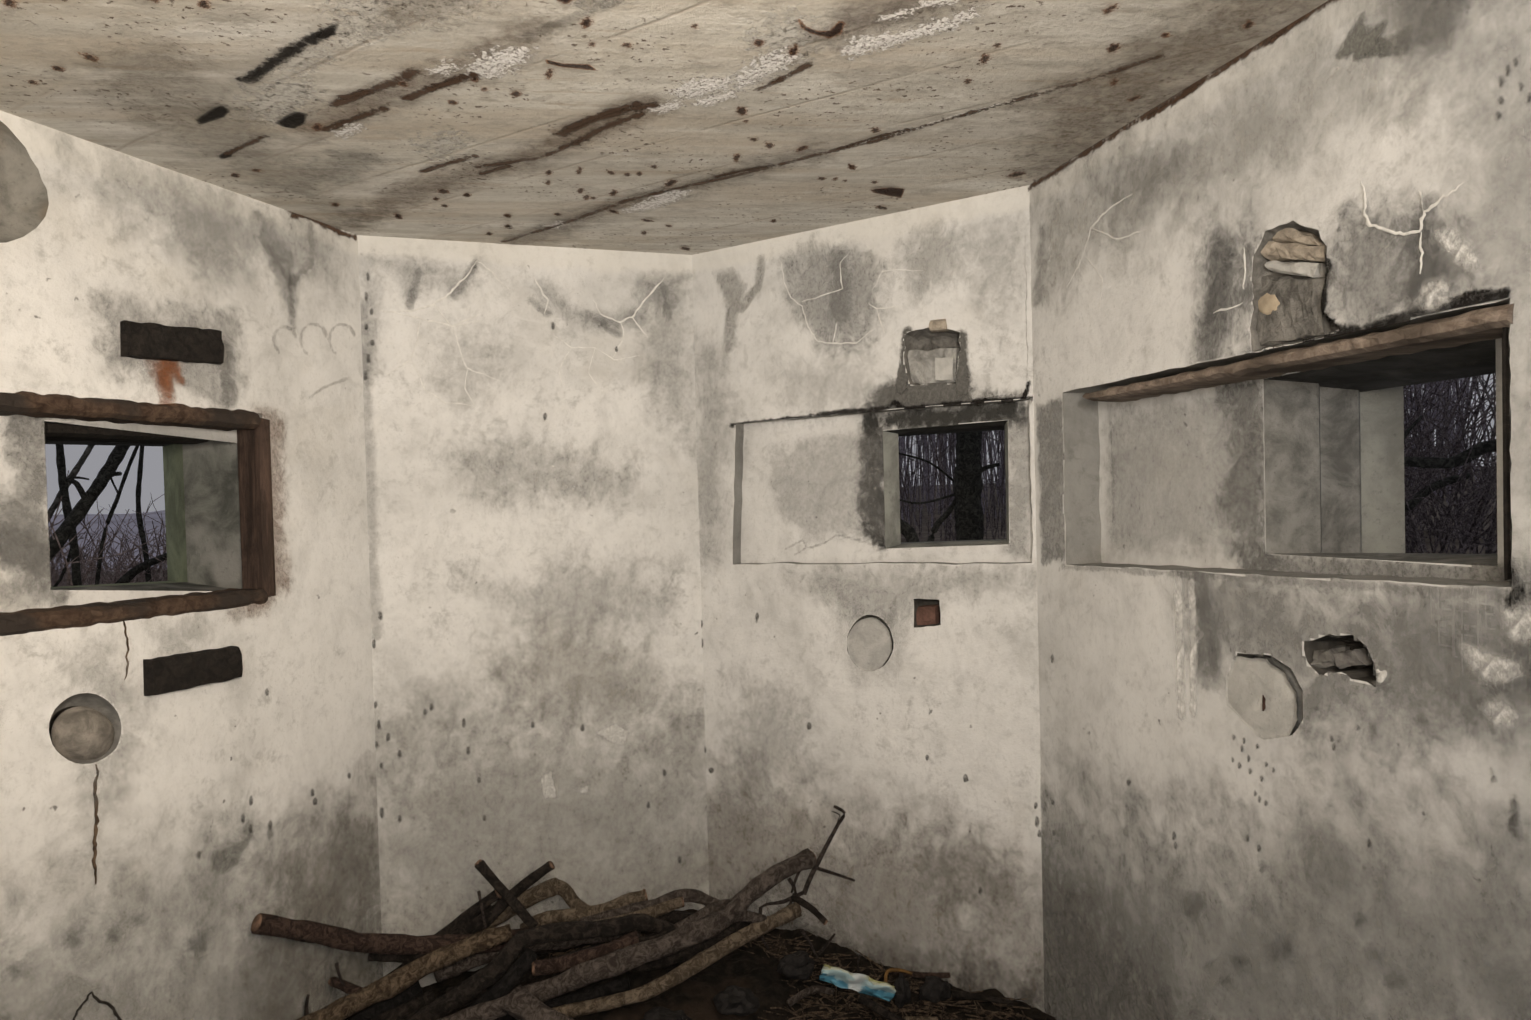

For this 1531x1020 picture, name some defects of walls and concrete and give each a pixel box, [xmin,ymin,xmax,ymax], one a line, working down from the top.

water stain [424,45,539,81]
water stain [836,0,982,61]
water stain [1025,0,1302,169]
spalling [1250,221,1339,352]
crack [1246,181,1510,354]
rust [155,360,184,405]
spalling [904,319,960,385]
spalling [1304,634,1391,687]
crack [91,764,99,884]
crack [73,991,122,1020]